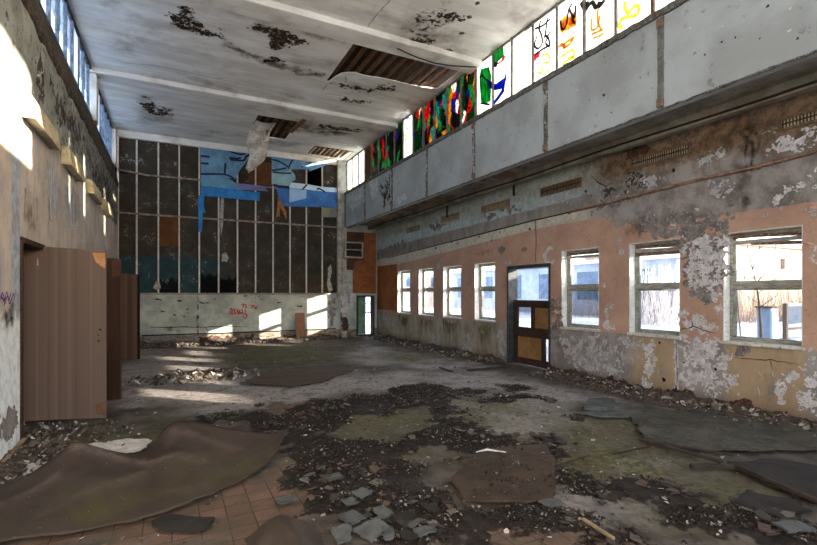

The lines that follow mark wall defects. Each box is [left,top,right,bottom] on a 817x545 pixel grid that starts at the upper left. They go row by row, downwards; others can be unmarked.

water stain [164,6,325,76]
mould [409,10,472,45]
water stain [138,101,175,117]
peeling [762,126,817,156]
peeling [550,179,759,409]
peeling [772,348,817,421]
flaking render [0,405,18,442]